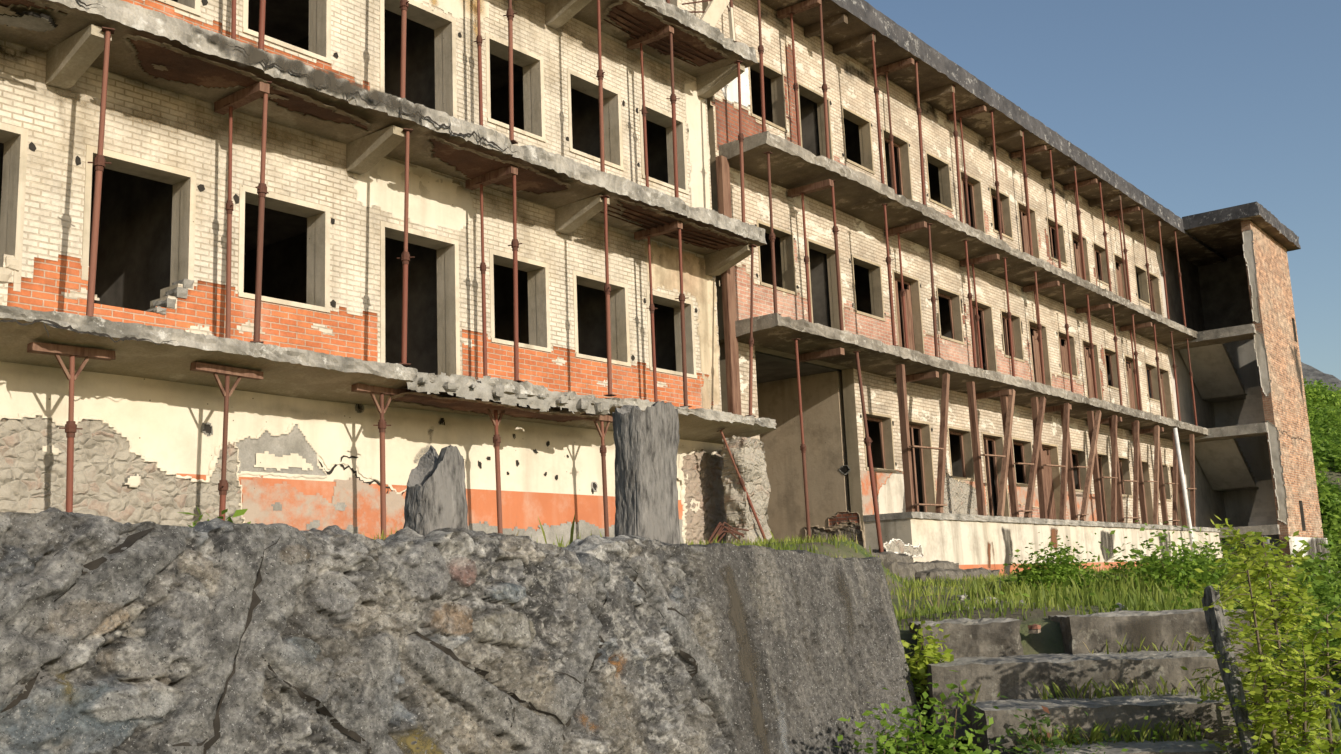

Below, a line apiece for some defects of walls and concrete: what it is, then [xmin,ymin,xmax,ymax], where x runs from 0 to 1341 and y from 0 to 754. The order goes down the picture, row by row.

flaking render [0,253,378,362]
flaking render [387,328,714,425]
peeling [0,412,405,537]
crack [318,455,406,495]
peeling [468,520,615,547]
peeling [677,446,727,545]